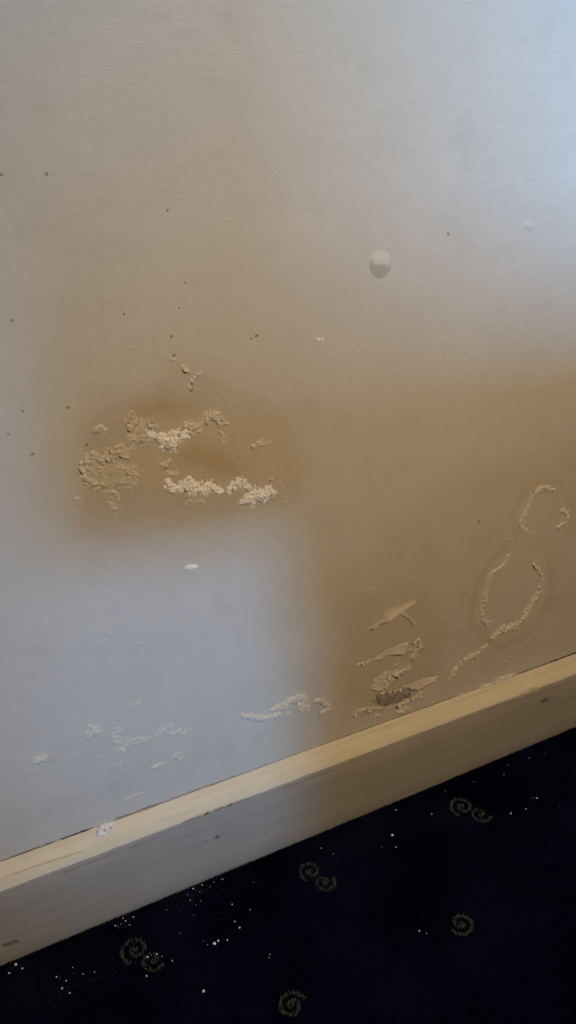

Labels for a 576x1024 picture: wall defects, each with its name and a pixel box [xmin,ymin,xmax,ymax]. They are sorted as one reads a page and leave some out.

peeling [72,408,288,515]
peeling [352,554,544,719]
peeling [239,692,333,724]